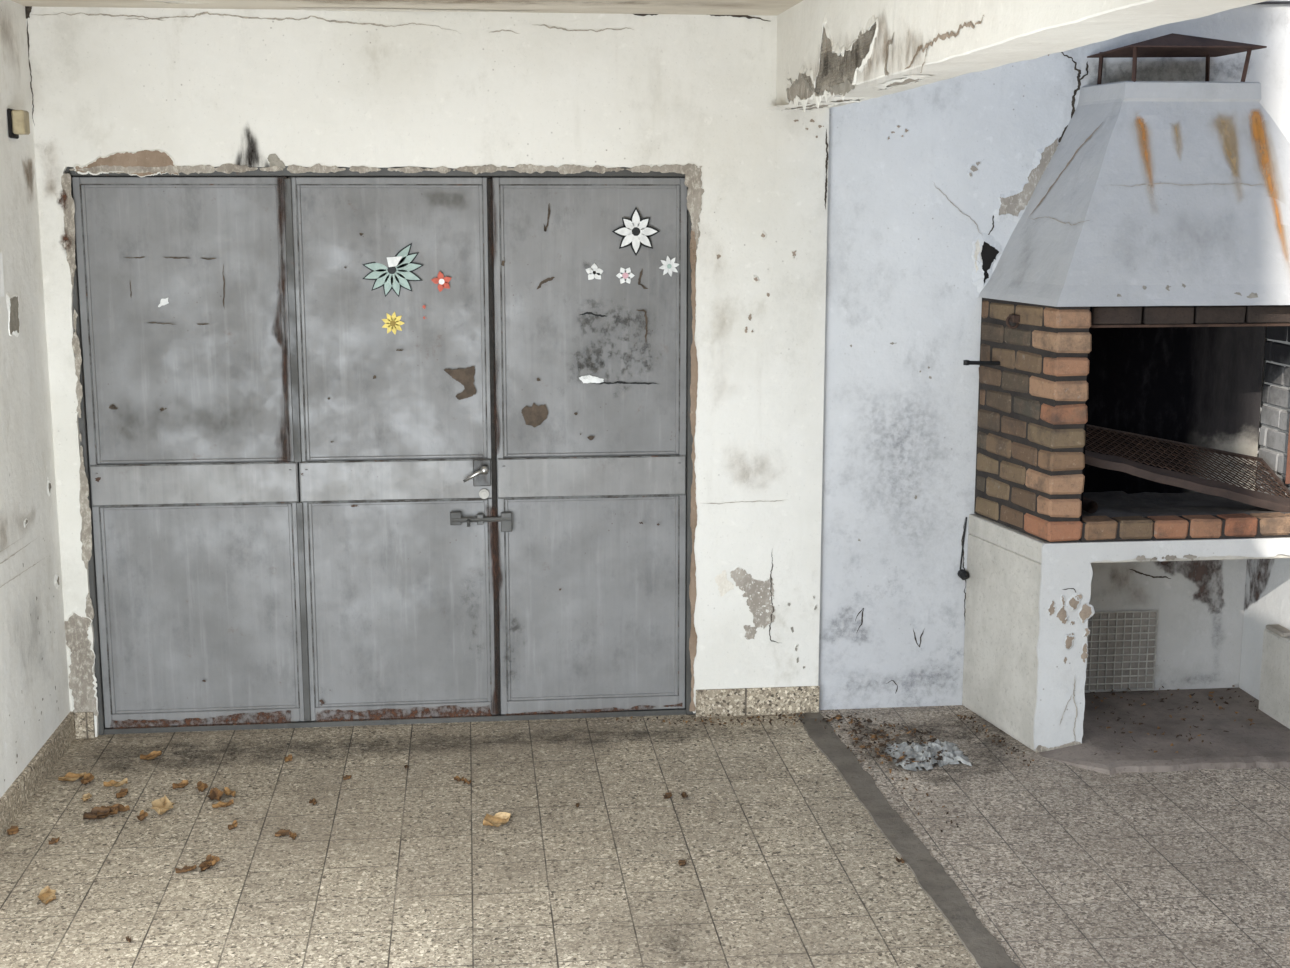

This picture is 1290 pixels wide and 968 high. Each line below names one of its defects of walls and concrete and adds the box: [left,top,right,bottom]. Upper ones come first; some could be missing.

spalling [767,13,933,210]
crack [934,183,994,235]
crack [1028,52,1103,226]
corrosion [1138,119,1150,172]
corrosion [1251,111,1284,244]
spalling [61,149,704,712]
spalling [30,593,98,716]
corrosion [112,710,291,729]
corrosion [487,507,502,602]
corrosion [318,670,683,722]
peeling [715,556,791,643]
peeling [1047,593,1095,664]